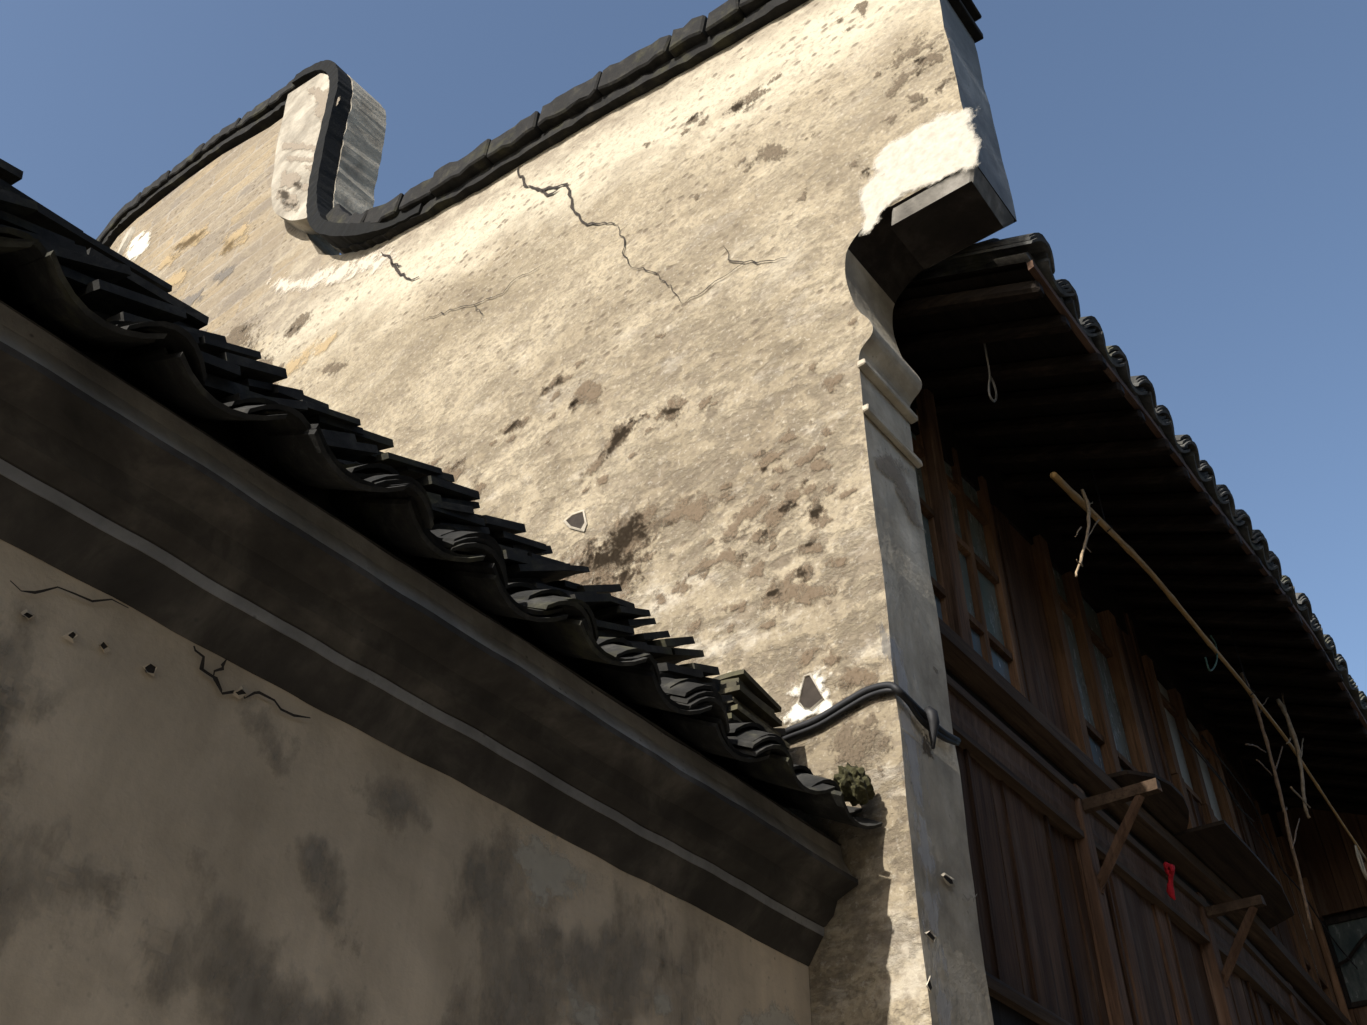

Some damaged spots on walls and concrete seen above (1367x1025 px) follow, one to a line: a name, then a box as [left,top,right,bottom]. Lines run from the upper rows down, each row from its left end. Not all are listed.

crack [517,165,786,302]
crack [381,252,419,280]
leakage [805,362,845,393]
leakage [427,456,485,495]
spalling [563,509,587,532]
leakage [561,420,857,633]
crack [10,580,129,608]
crack [193,646,311,718]
peeling [784,671,832,723]
leakage [462,850,687,1025]